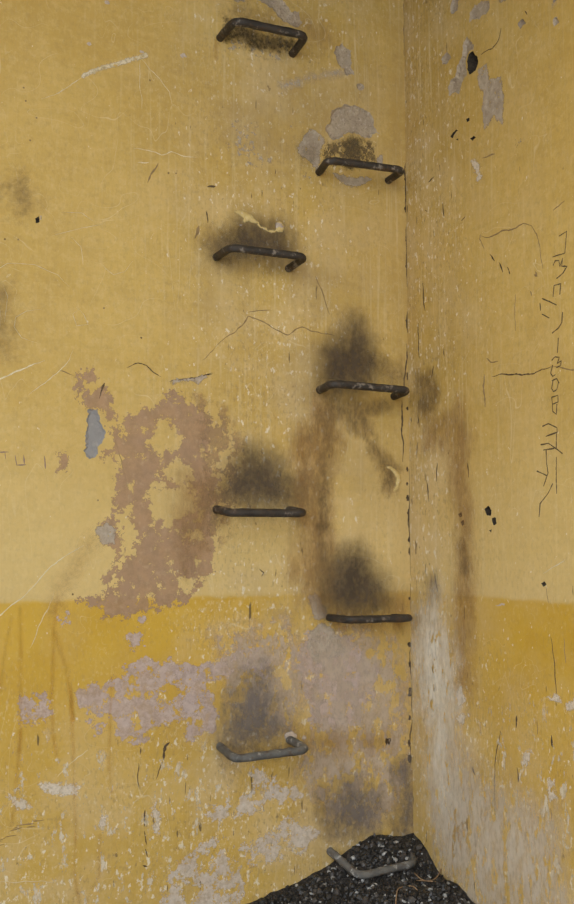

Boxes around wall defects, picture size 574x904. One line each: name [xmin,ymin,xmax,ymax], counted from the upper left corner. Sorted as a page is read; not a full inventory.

spalling [259,0,302,27]
peeling [441,30,504,129]
spalling [297,104,379,178]
peeling [235,210,285,233]
crack [127,278,334,385]
peeling [72,367,408,904]
peeling [17,692,54,727]
peeling [0,754,39,832]
peeling [37,759,87,817]
peeling [420,608,574,904]